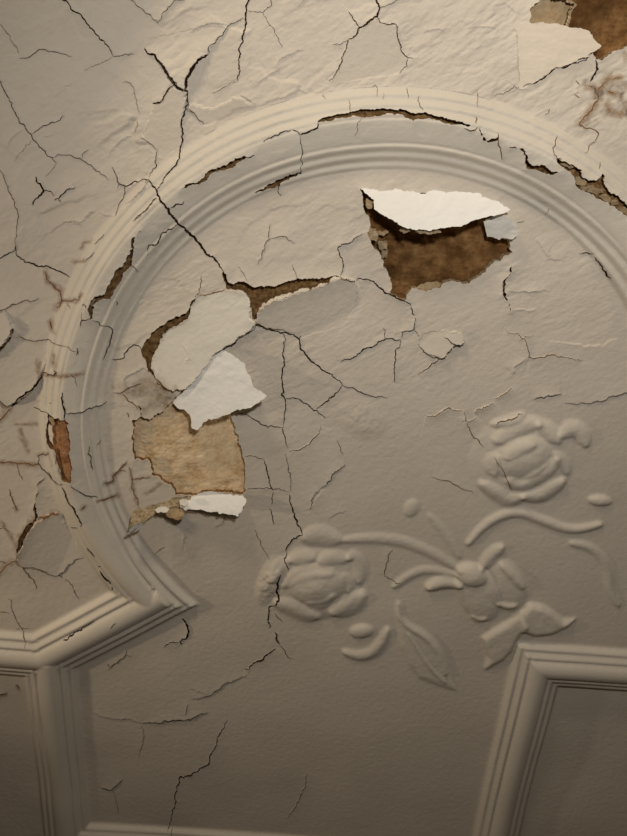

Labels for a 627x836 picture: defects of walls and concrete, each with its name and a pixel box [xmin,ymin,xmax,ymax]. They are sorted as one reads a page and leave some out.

spalling [515,0,627,89]
crack [254,84,627,216]
crack [496,57,613,153]
spalling [360,188,519,300]
crack [502,267,512,312]
crack [0,0,464,750]
crack [510,333,582,361]
spalling [45,414,73,484]
spalling [126,350,267,535]
crack [428,388,519,489]
crack [168,721,227,834]